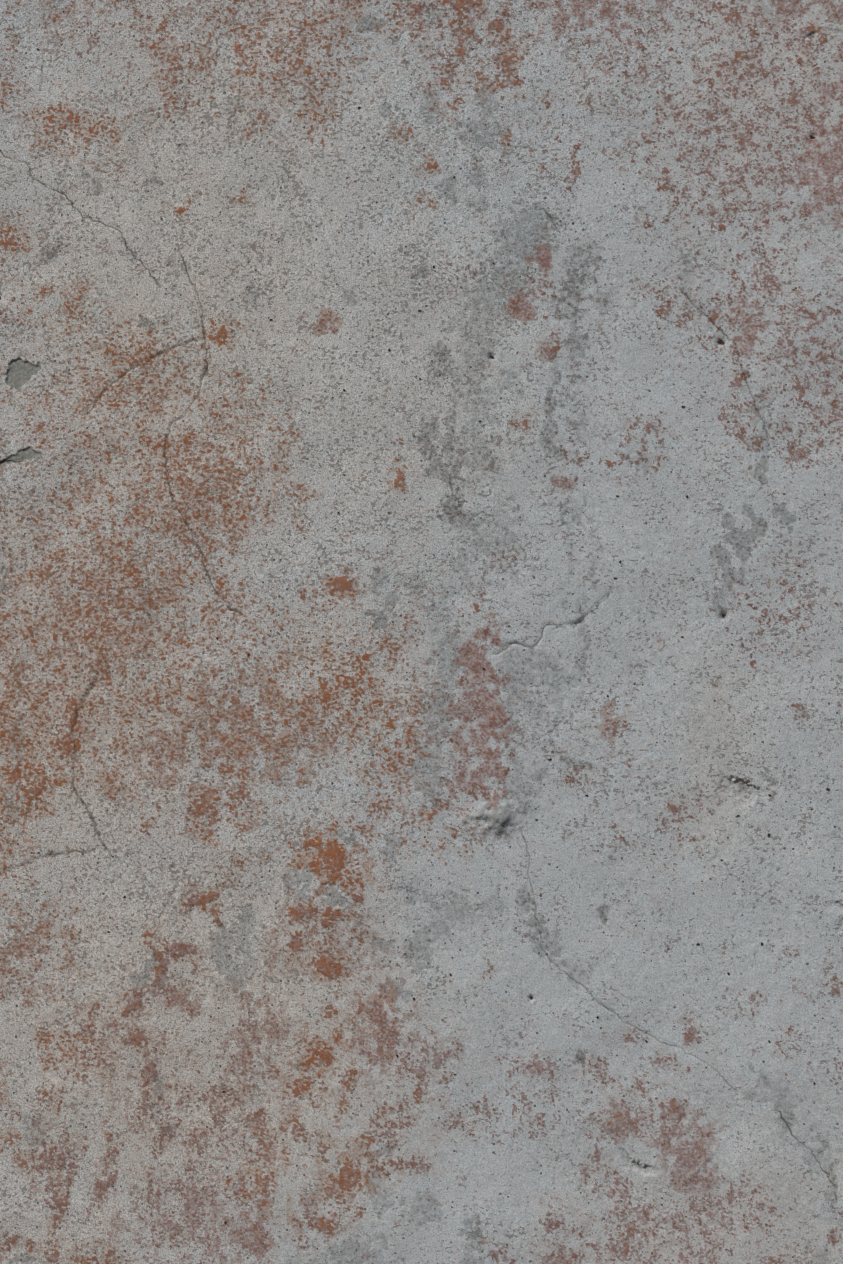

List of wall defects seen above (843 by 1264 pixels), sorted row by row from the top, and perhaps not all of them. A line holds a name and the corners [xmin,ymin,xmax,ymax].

rust [0,0,369,156]
rust [413,154,441,209]
rust [535,136,584,198]
rust [0,210,40,262]
spalling [6,358,41,391]
spalling [0,447,42,468]
rust [0,276,478,1007]
rust [34,1002,108,1111]
rust [221,1004,386,1263]